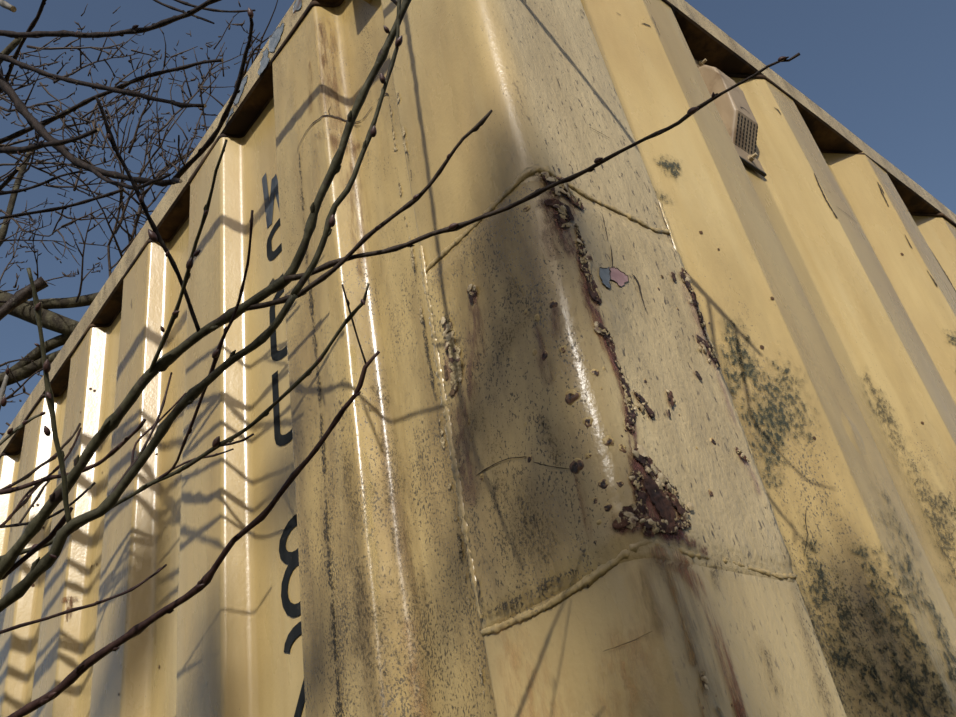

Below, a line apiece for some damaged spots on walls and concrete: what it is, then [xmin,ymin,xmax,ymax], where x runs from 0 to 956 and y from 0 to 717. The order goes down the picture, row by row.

crack [297,93,389,150]
peeling [599,266,629,288]
corrosion [523,171,708,665]
damp [720,319,817,487]
damp [864,374,904,450]
damp [308,279,343,717]
damp [908,463,956,581]
damp [353,562,387,694]
corrosion [715,637,746,717]
damp [798,490,956,717]